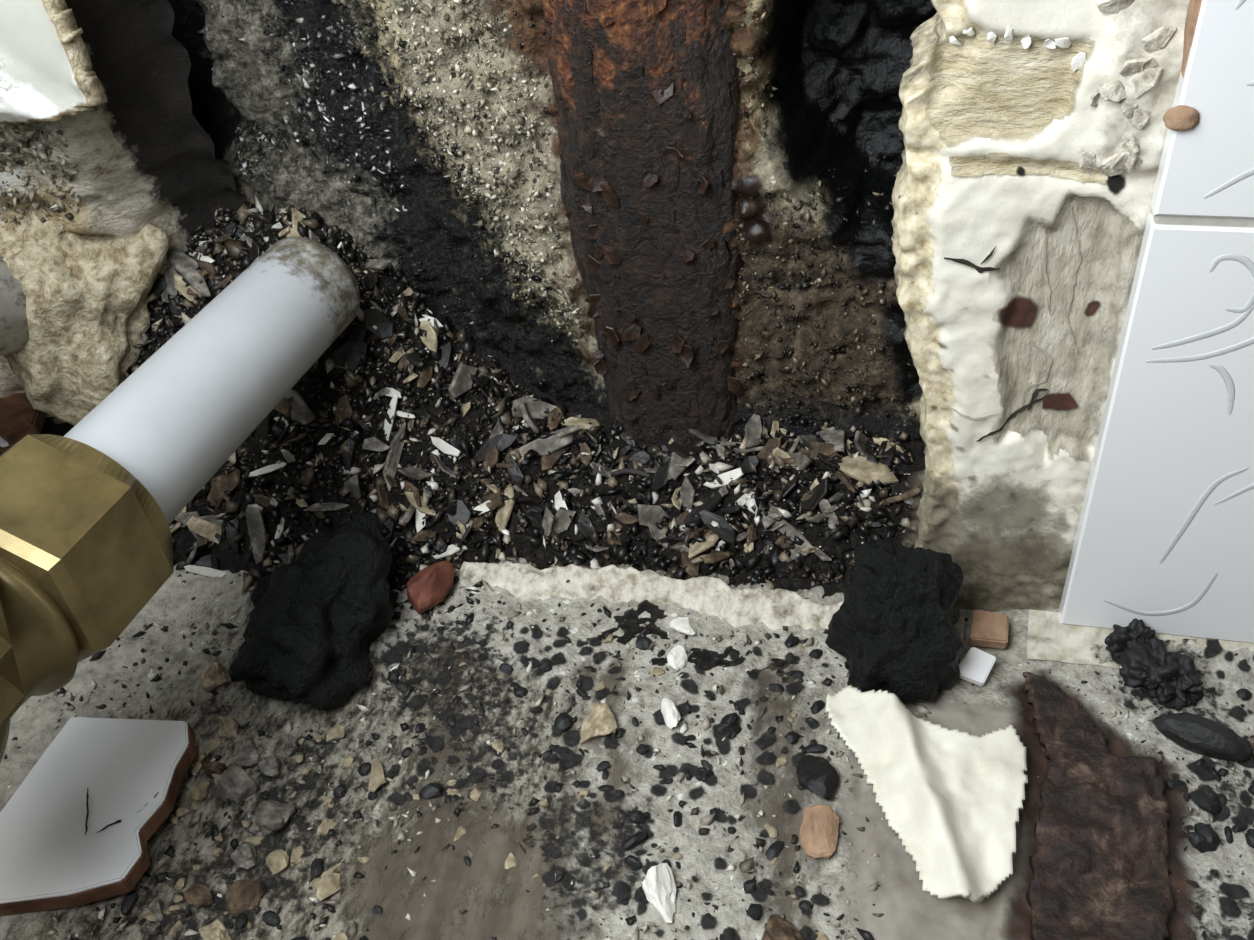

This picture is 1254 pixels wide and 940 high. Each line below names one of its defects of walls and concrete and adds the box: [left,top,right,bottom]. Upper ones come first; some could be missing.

corrosion [480,0,560,155]
corrosion [652,83,675,107]
spalling [925,26,1094,147]
spalling [1095,0,1135,14]
water stain [194,0,595,405]
corrosion [545,176,642,375]
corrosion [708,0,771,394]
spalling [990,26,1176,460]